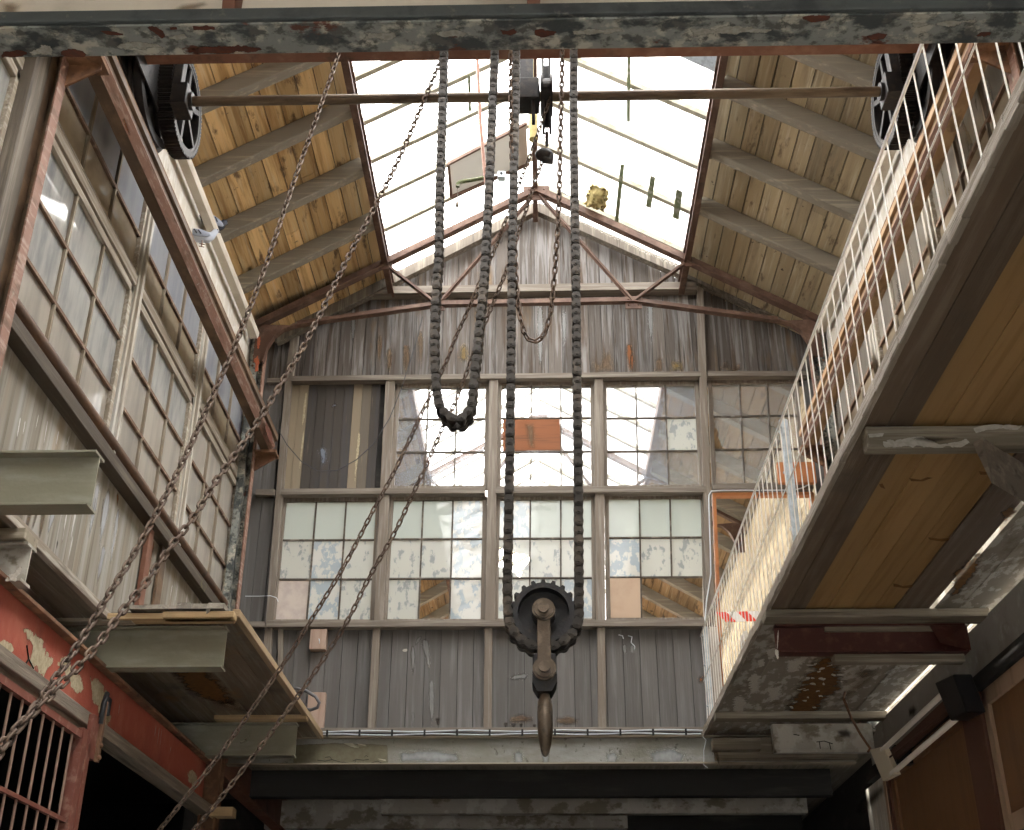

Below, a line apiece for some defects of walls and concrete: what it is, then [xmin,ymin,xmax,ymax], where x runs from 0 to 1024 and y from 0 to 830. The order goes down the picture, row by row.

rust [147,26,177,38]
rust [534,29,556,38]
rust [188,45,262,54]
peeling [868,424,1022,448]
peeling [24,629,111,725]
peeling [732,648,846,711]